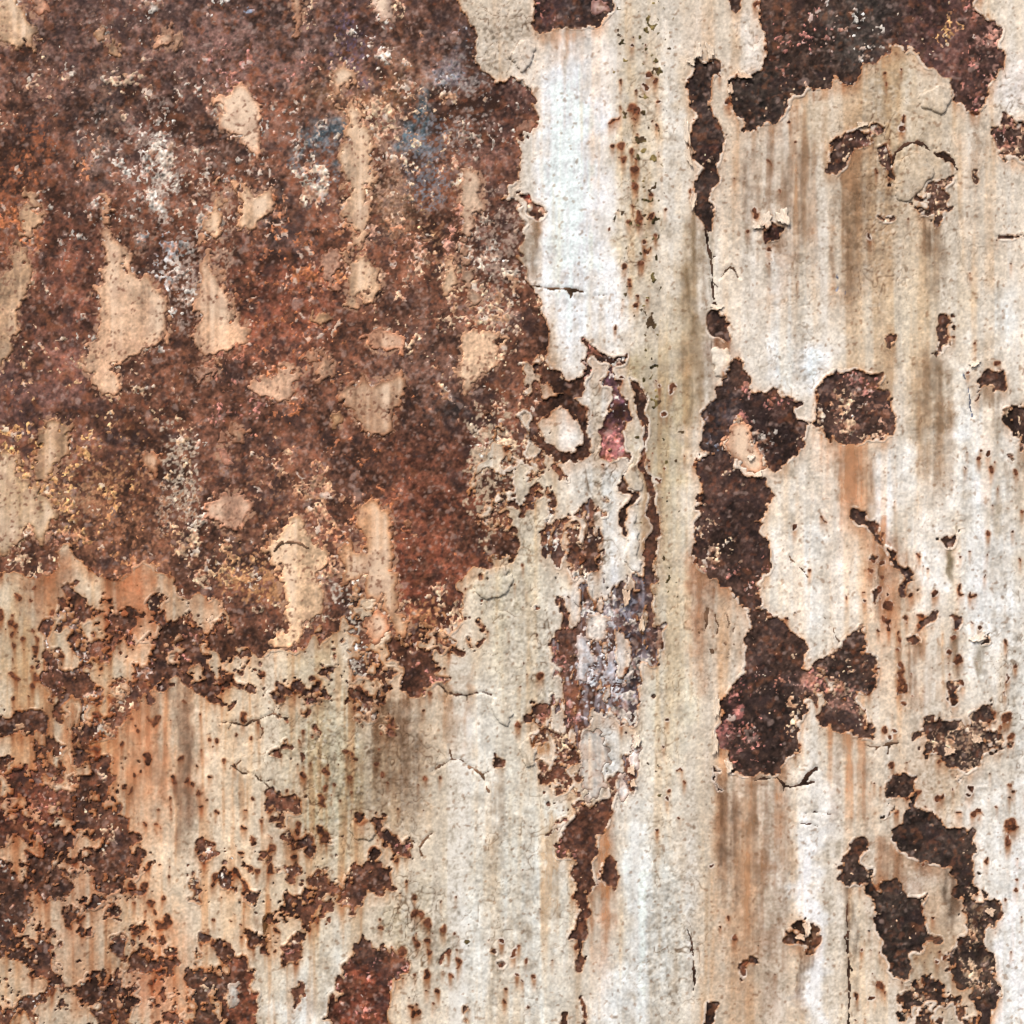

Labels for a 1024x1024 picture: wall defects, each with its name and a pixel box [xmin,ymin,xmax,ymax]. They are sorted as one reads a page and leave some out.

spalling [608,72,662,135]
spalling [610,142,653,196]
spalling [617,204,667,225]
crack [529,285,604,299]
spalling [621,234,657,309]
peeling [720,421,767,474]
rust [0,0,668,1024]
spalling [862,532,924,706]
spalling [946,621,982,686]
spalling [986,711,1015,747]
spalling [888,785,998,817]
spalling [1003,818,1019,846]